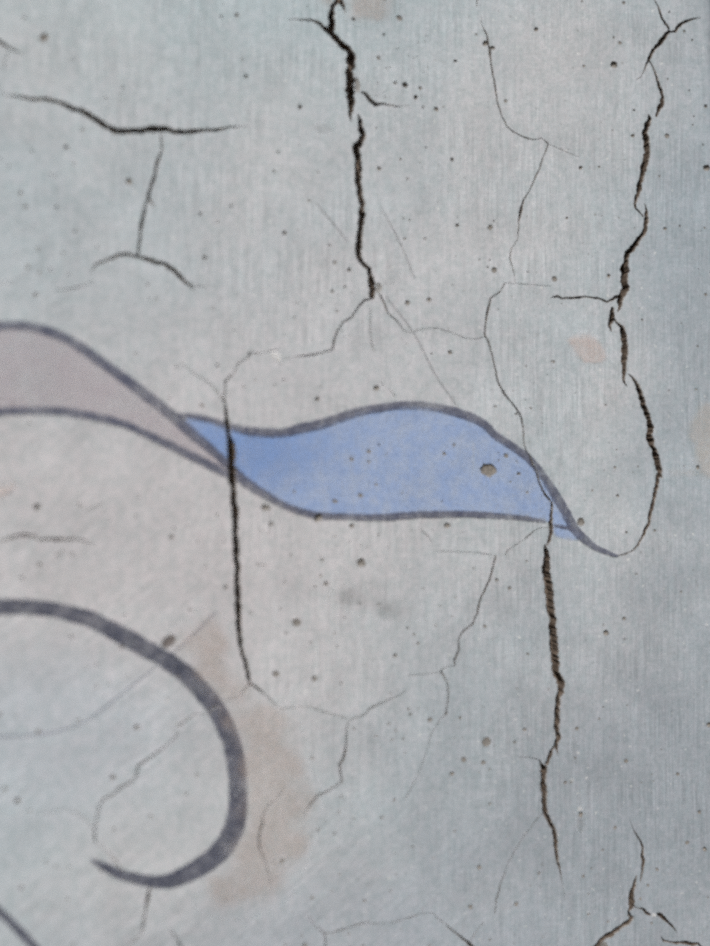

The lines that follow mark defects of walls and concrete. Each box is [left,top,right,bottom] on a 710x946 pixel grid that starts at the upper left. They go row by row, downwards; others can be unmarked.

crack [0,40,23,68]
crack [1,93,249,290]
crack [1,534,92,545]
crack [39,348,406,871]
crack [288,0,701,946]
crack [125,887,151,946]